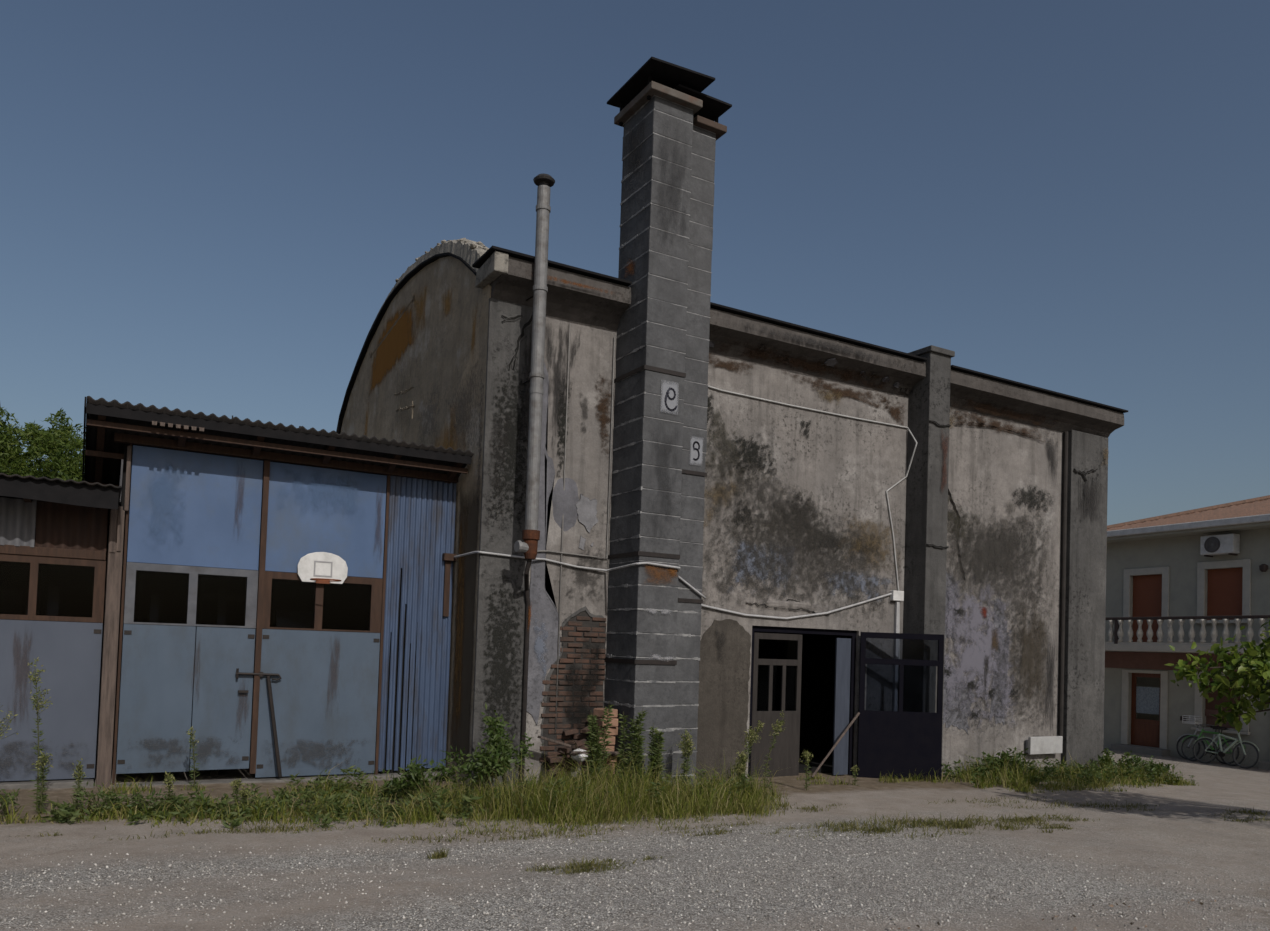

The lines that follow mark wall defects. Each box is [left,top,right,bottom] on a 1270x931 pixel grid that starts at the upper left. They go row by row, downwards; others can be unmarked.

damp [420,334,531,762]
spalling [527,363,606,772]
damp [547,329,612,476]
damp [569,556,602,593]
damp [704,395,889,600]
damp [947,486,1055,728]